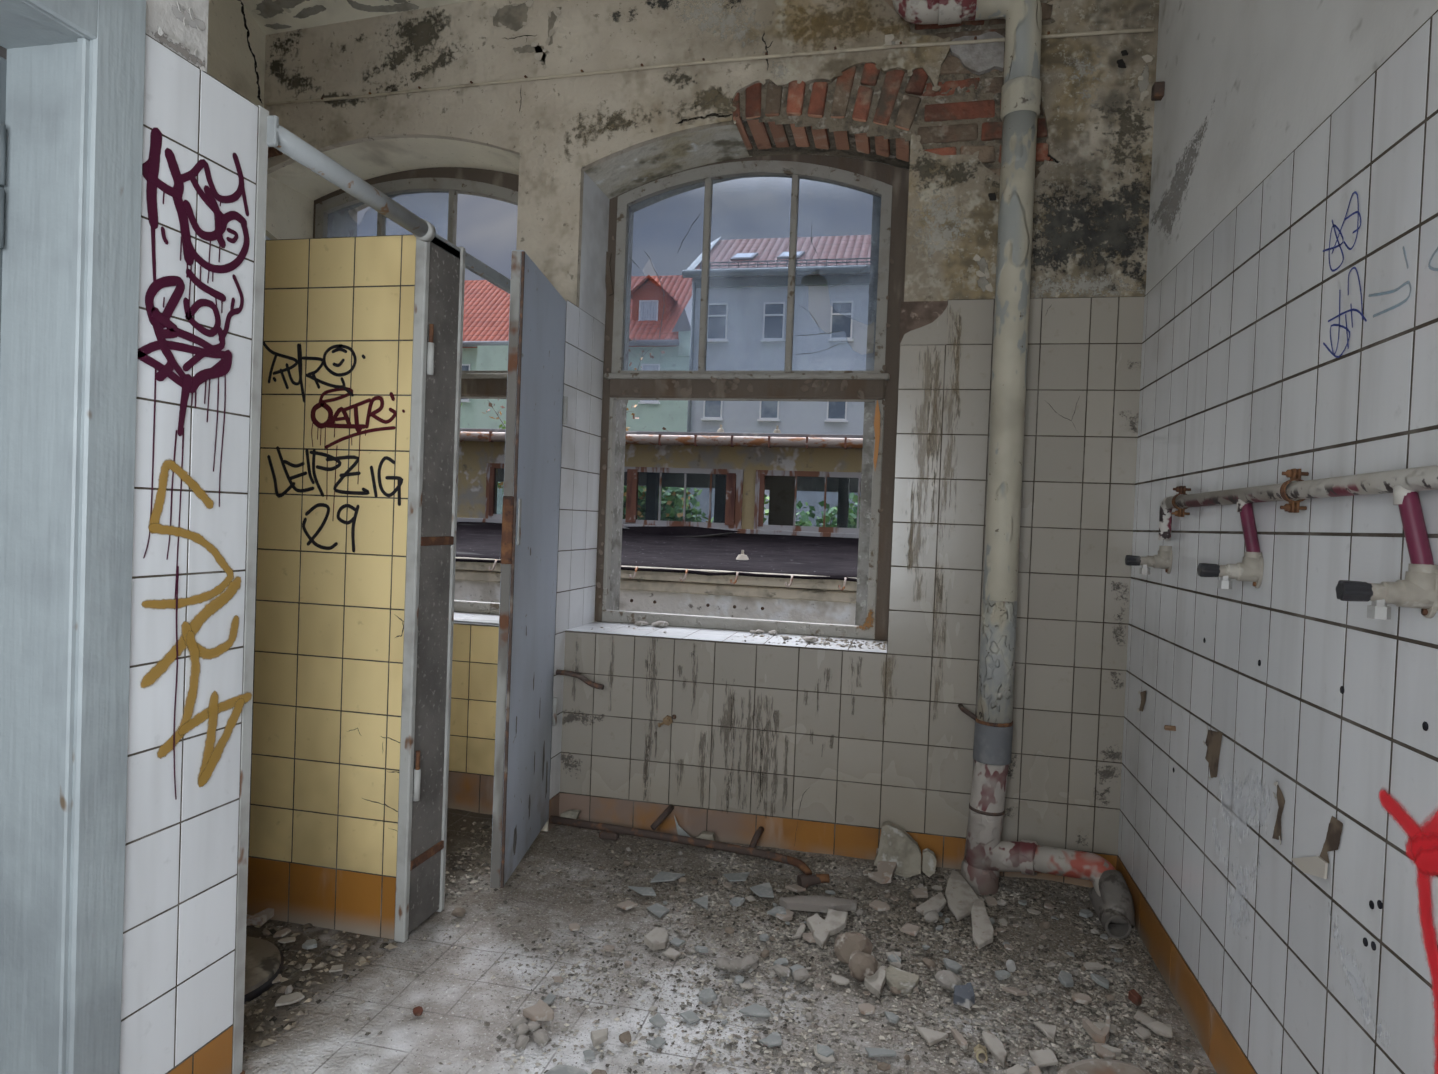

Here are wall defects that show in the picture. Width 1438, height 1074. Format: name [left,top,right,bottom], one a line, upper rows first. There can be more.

crack [238,0,262,103]
peeling [252,0,419,30]
leakage [270,6,461,107]
leakage [612,0,672,22]
leakage [565,69,739,154]
flaking render [732,0,1006,176]
flaking render [1035,82,1054,178]
leakage [1031,100,1152,291]
leakage [643,638,658,799]
leakage [699,689,788,816]
spalling [1203,727,1223,780]
spalling [1272,781,1343,879]